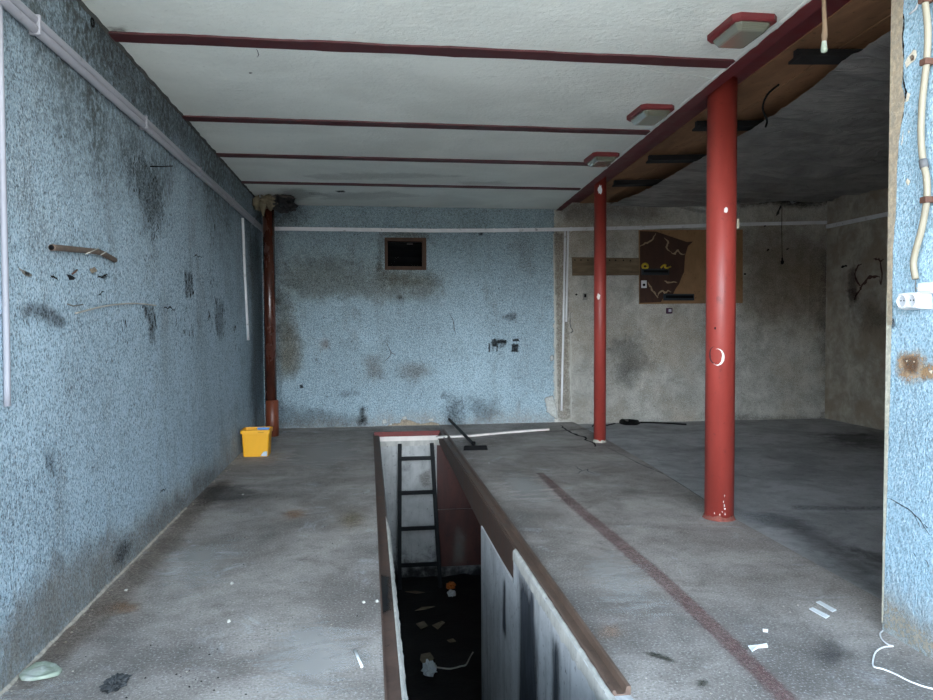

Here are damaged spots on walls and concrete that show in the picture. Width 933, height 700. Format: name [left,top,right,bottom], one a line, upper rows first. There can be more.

rust [897,354,933,381]
crack [888,498,930,535]